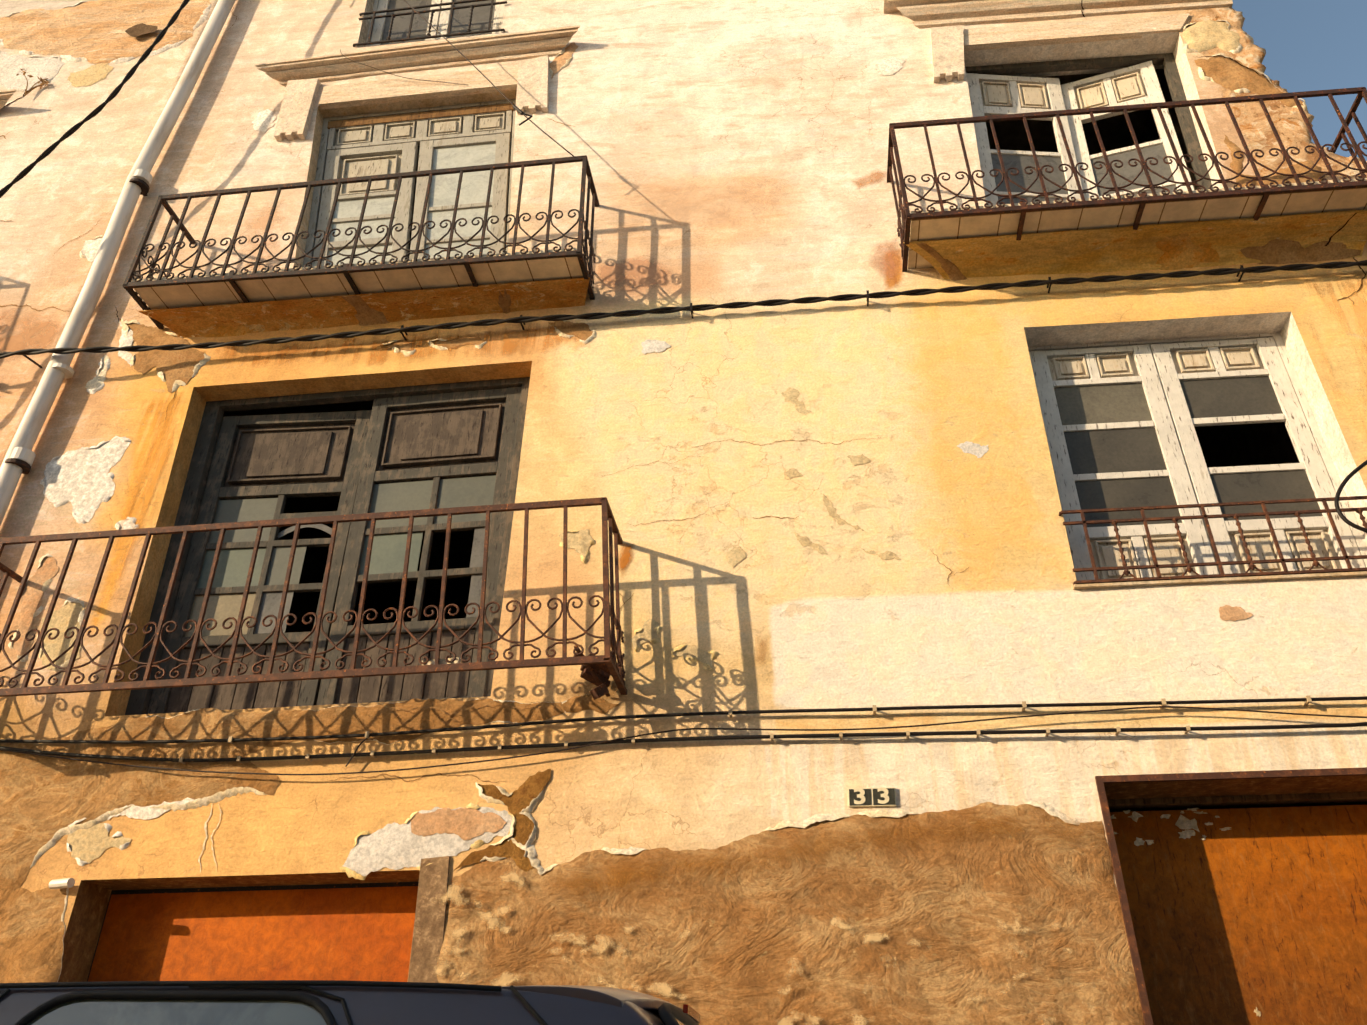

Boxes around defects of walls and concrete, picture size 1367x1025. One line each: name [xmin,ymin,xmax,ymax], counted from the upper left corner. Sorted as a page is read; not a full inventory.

flaking render [0,0,211,92]
flaking render [85,318,211,394]
flaking render [40,436,131,524]
flaking render [0,695,619,983]
peeling [1161,808,1231,840]
flaking render [339,769,1154,1025]